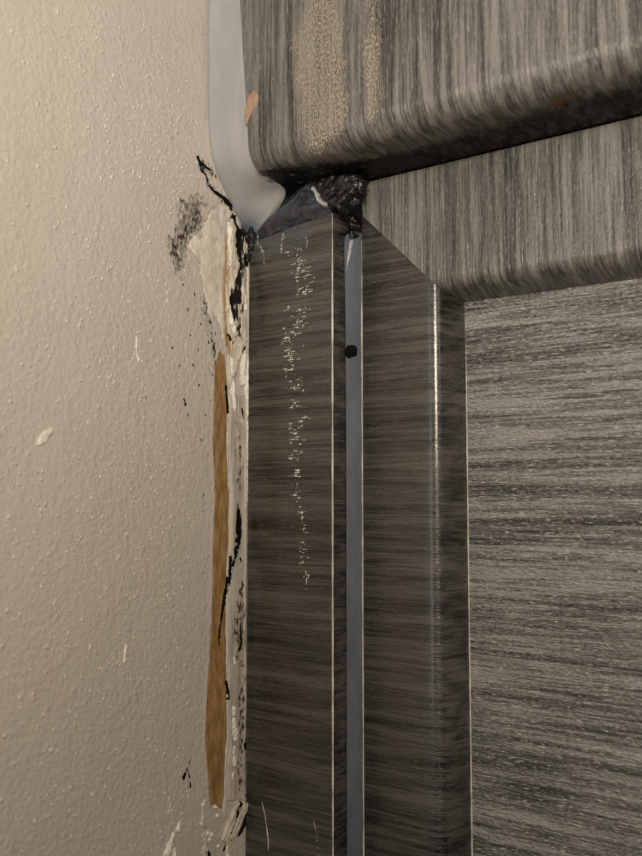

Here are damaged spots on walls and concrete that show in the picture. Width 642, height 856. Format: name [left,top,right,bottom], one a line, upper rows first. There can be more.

leakage [169,199,202,269]
crack [196,156,248,344]
peeling [187,203,249,851]